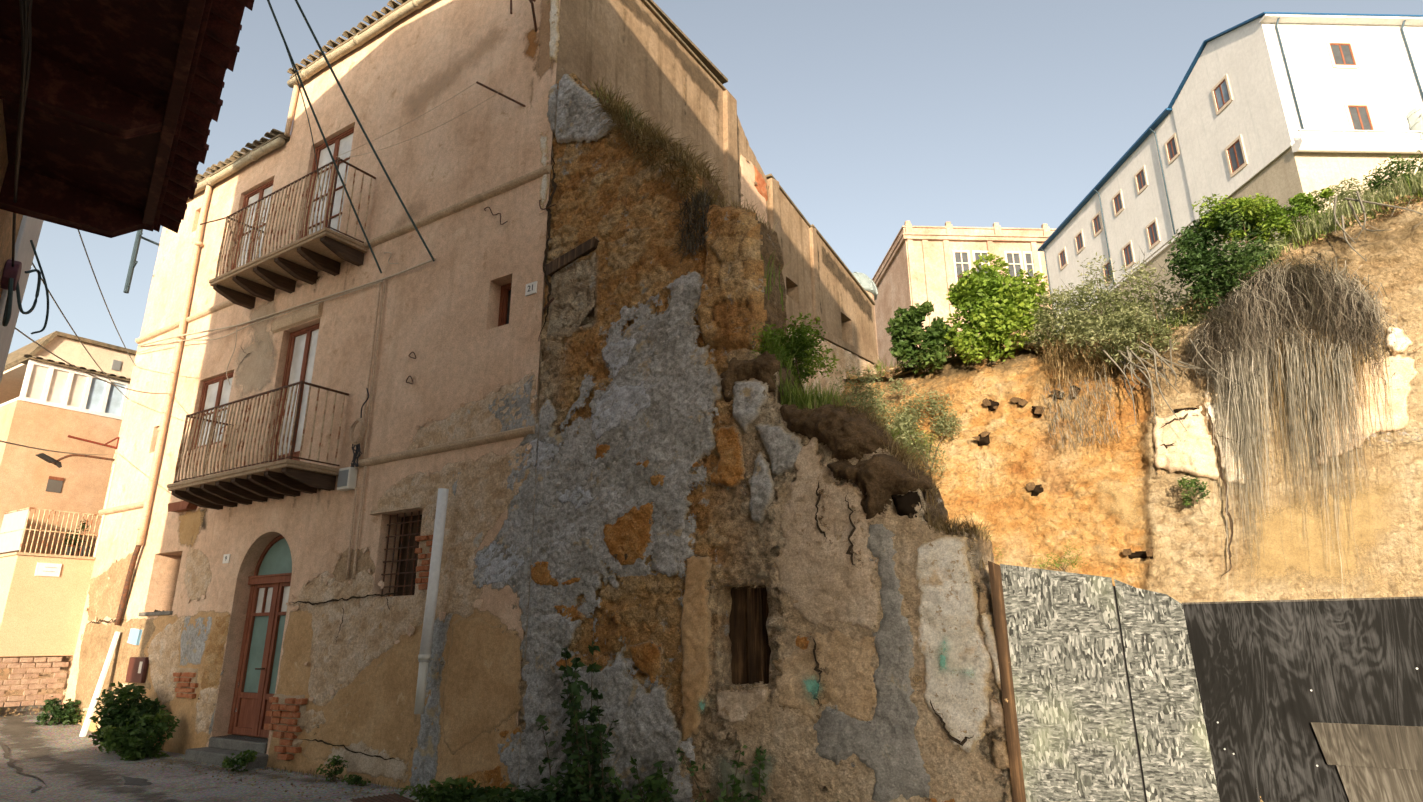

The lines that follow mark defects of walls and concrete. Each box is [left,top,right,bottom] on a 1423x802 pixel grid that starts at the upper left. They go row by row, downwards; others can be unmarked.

peeling [264,271,1013,802]
crack [815,481,864,569]